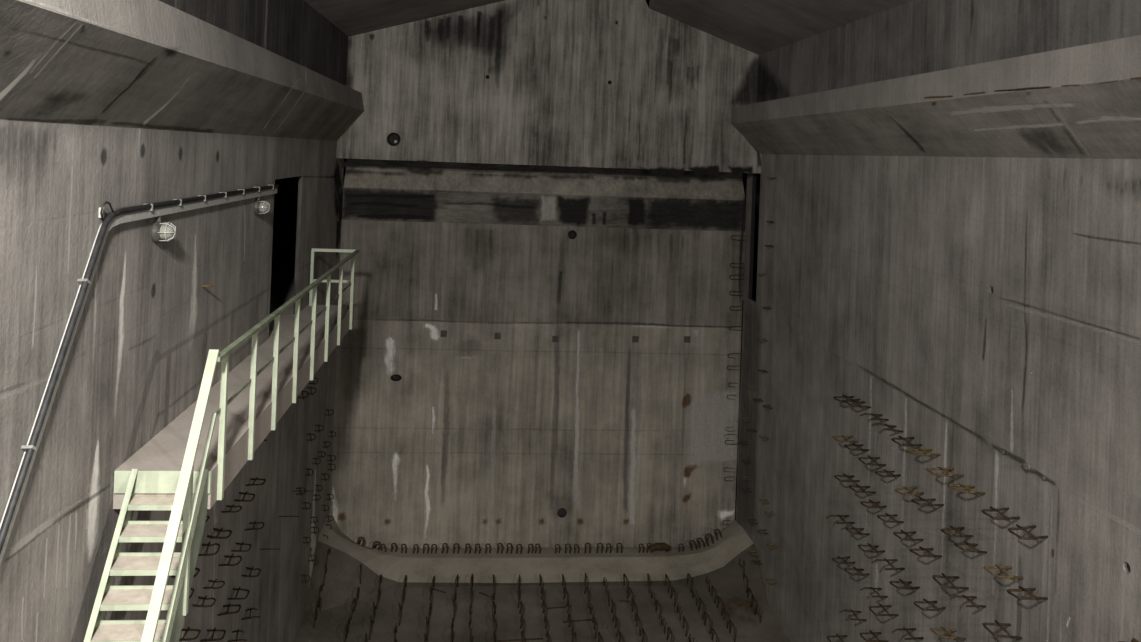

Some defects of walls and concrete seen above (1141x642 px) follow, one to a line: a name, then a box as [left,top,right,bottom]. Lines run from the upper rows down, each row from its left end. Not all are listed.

damp [427,9,507,57]
damp [0,23,83,101]
damp [385,337,395,372]
corrosion [683,465,697,502]